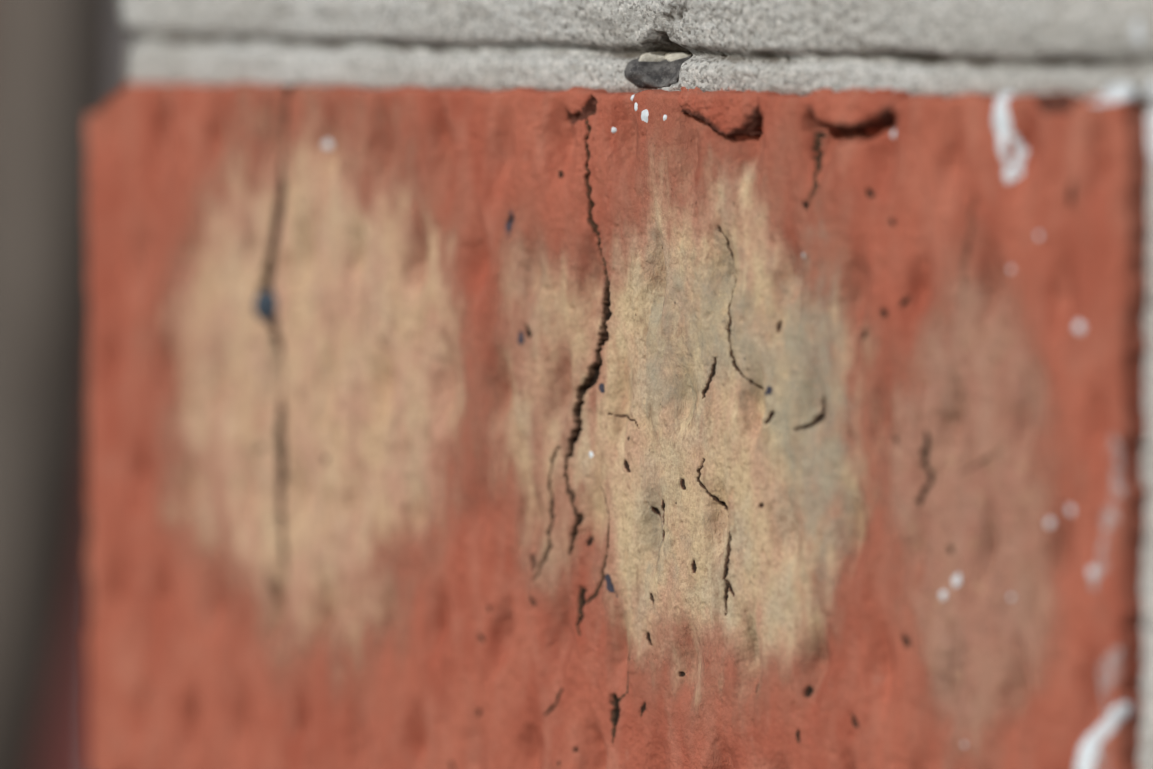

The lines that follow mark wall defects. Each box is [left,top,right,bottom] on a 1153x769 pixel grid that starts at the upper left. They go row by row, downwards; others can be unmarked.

peeling [678,87,768,139]
crack [808,132,828,204]
peeling [804,86,909,135]
crack [259,91,291,610]
crack [532,111,638,636]
crack [702,226,764,399]
crack [794,396,825,431]
crack [697,458,732,615]